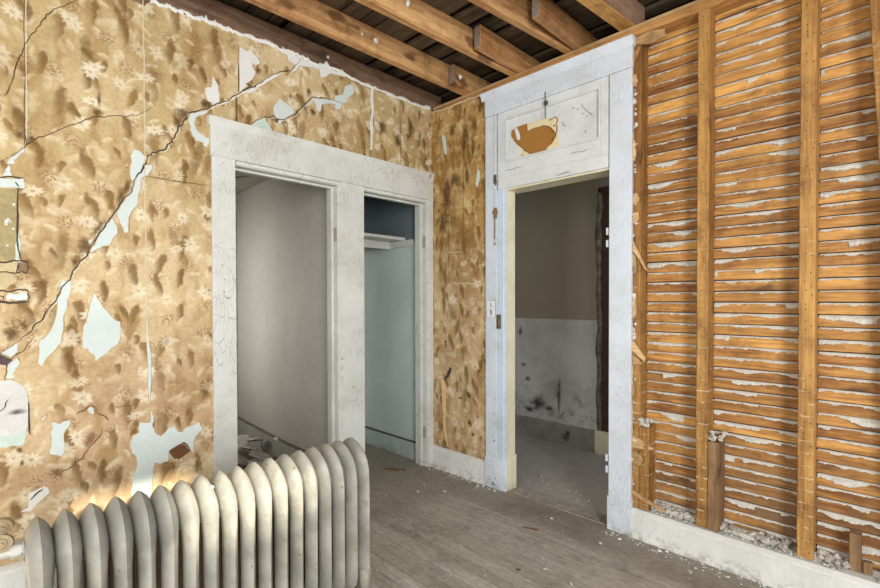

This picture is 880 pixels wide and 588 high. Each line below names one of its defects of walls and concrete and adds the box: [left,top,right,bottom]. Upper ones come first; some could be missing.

crack [2,0,76,97]
peeling [187,46,354,147]
crack [252,97,341,123]
peeling [88,150,153,253]
crack [0,58,301,379]
peeling [81,294,121,361]
flaking render [647,29,698,514]
flaking render [714,0,801,543]
flaking render [817,0,880,565]
crack [52,404,139,480]
peeling [129,317,204,498]
water stain [526,383,560,411]